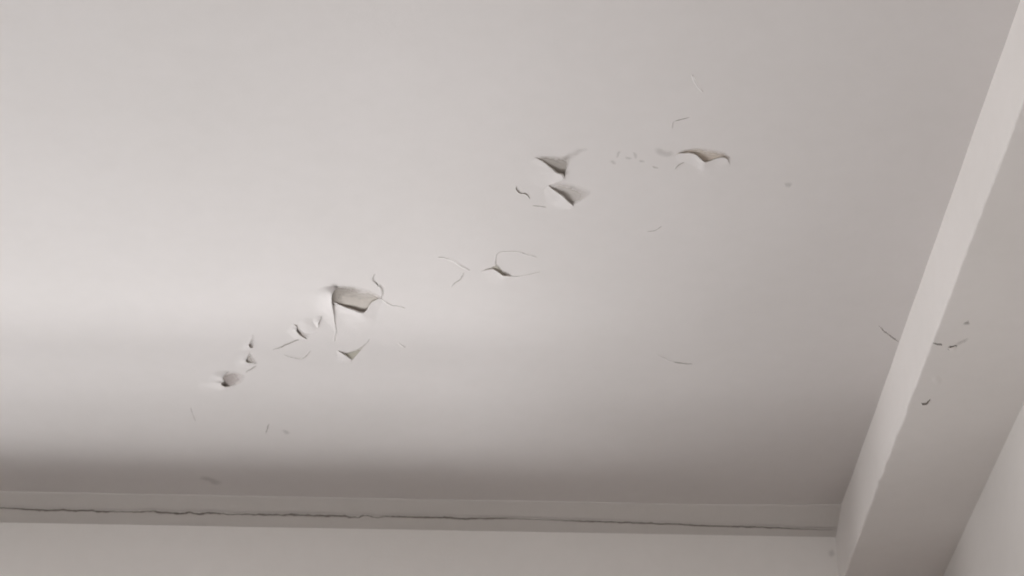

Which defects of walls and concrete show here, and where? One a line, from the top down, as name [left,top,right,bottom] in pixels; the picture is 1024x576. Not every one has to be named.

peeling [286,274,405,365]